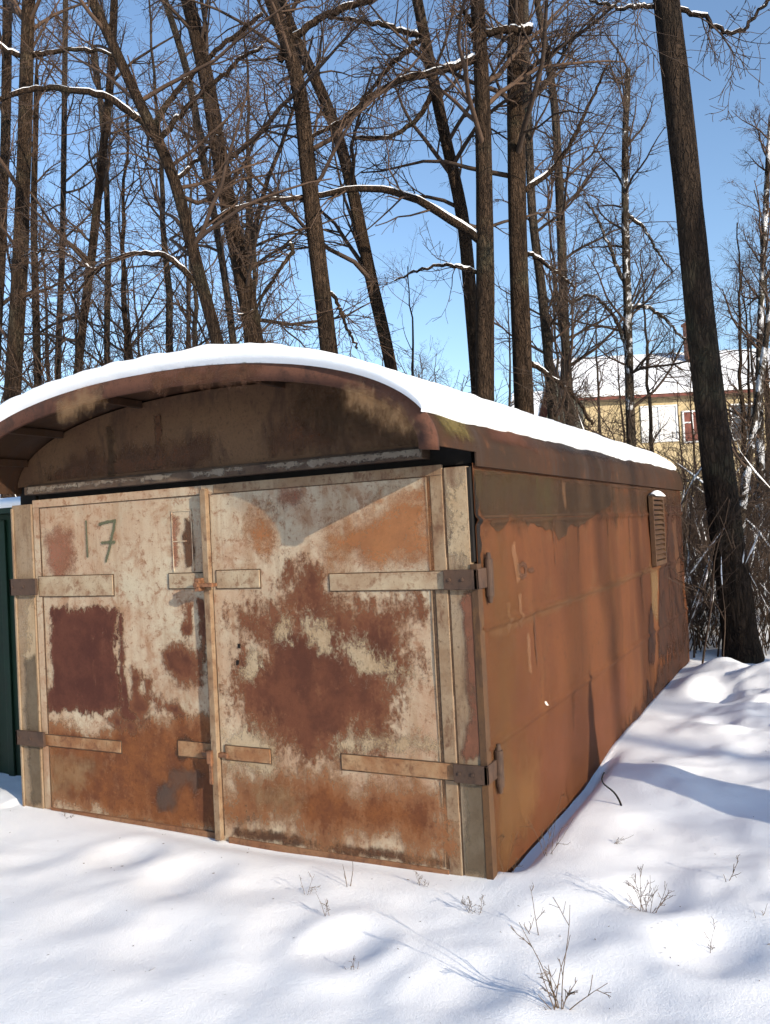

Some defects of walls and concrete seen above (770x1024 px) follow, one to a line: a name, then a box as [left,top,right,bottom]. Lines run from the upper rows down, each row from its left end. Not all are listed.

rust [245,489,301,554]
rust [325,480,435,570]
peeling [475,472,612,541]
rust [476,470,690,738]
rust [48,712,460,868]